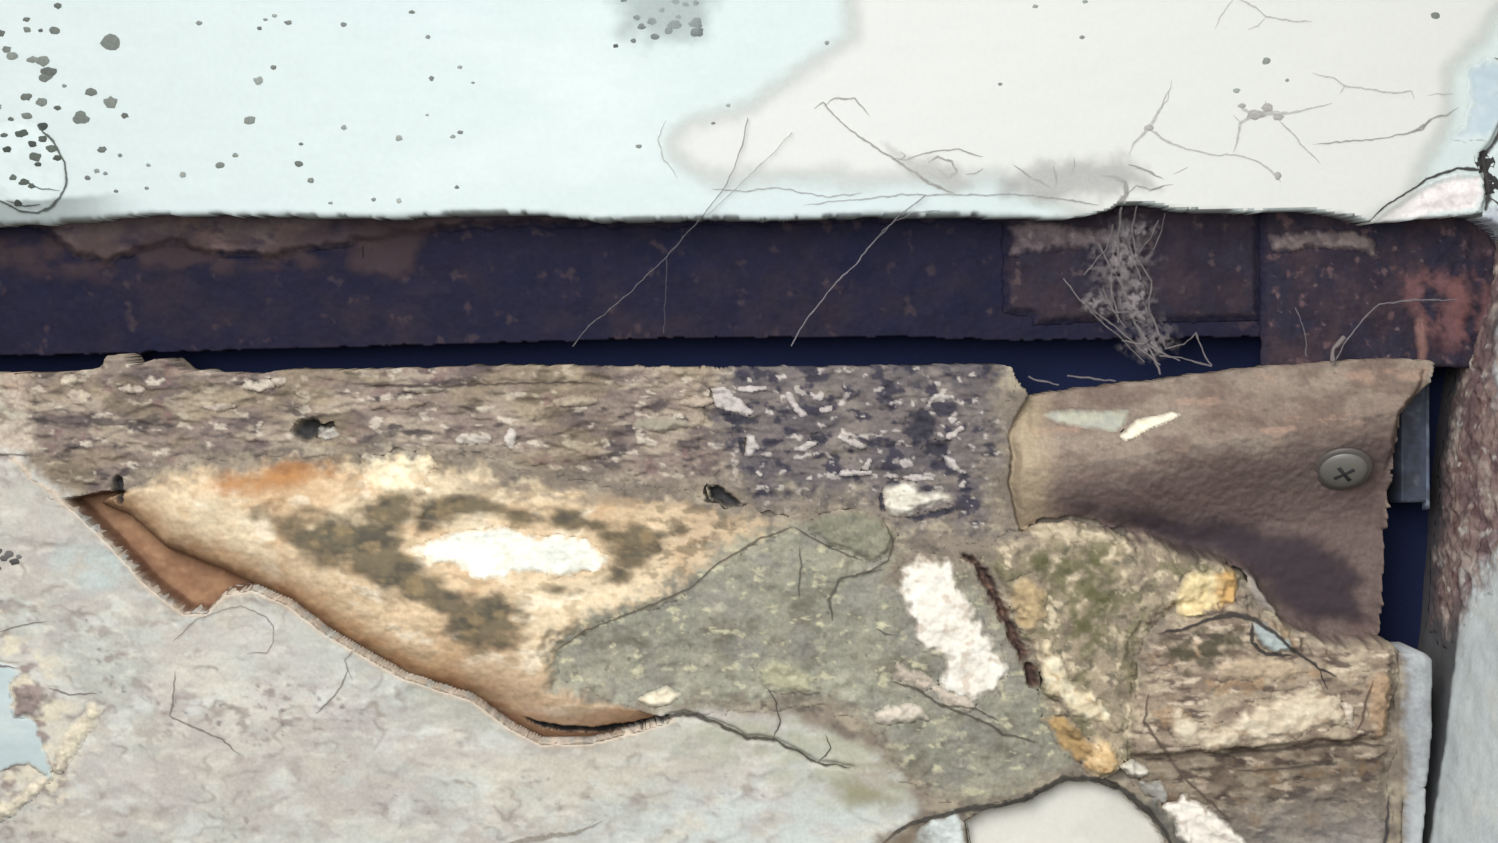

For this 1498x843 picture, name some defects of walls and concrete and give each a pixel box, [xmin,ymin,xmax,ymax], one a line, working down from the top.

leakage [23,17,60,34]
leakage [613,0,703,48]
crack [1215,0,1312,30]
leakage [0,30,129,124]
leakage [85,146,122,193]
crack [715,73,1459,210]
crack [1371,131,1498,220]
rust [1405,271,1491,361]
peeling [0,172,1498,843]
leakage [275,494,665,648]
crack [668,688,852,768]